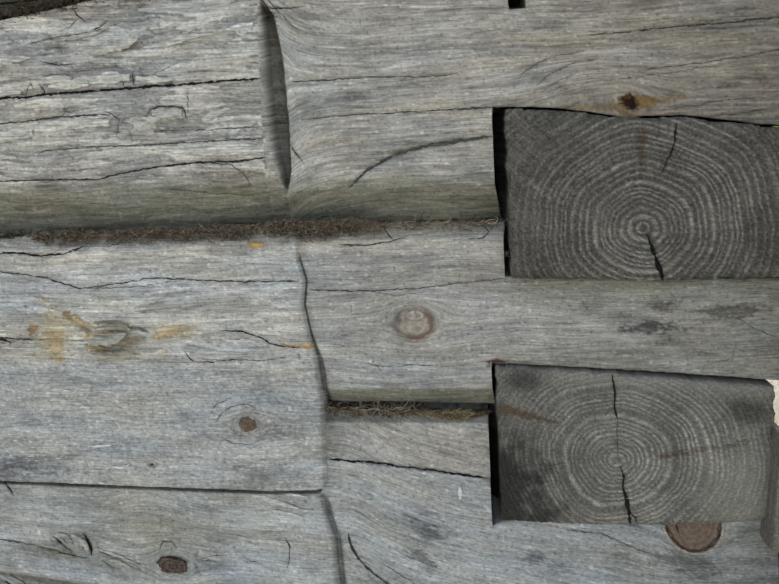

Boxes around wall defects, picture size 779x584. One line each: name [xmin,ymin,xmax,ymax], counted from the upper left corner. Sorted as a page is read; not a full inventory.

crack [28,7,121,44]
crack [0,61,266,196]
crack [0,246,503,296]
crack [341,229,405,246]
crack [646,233,664,281]
peeling [85,320,148,361]
crack [330,458,489,479]
crack [611,373,638,525]
crack [566,529,654,555]